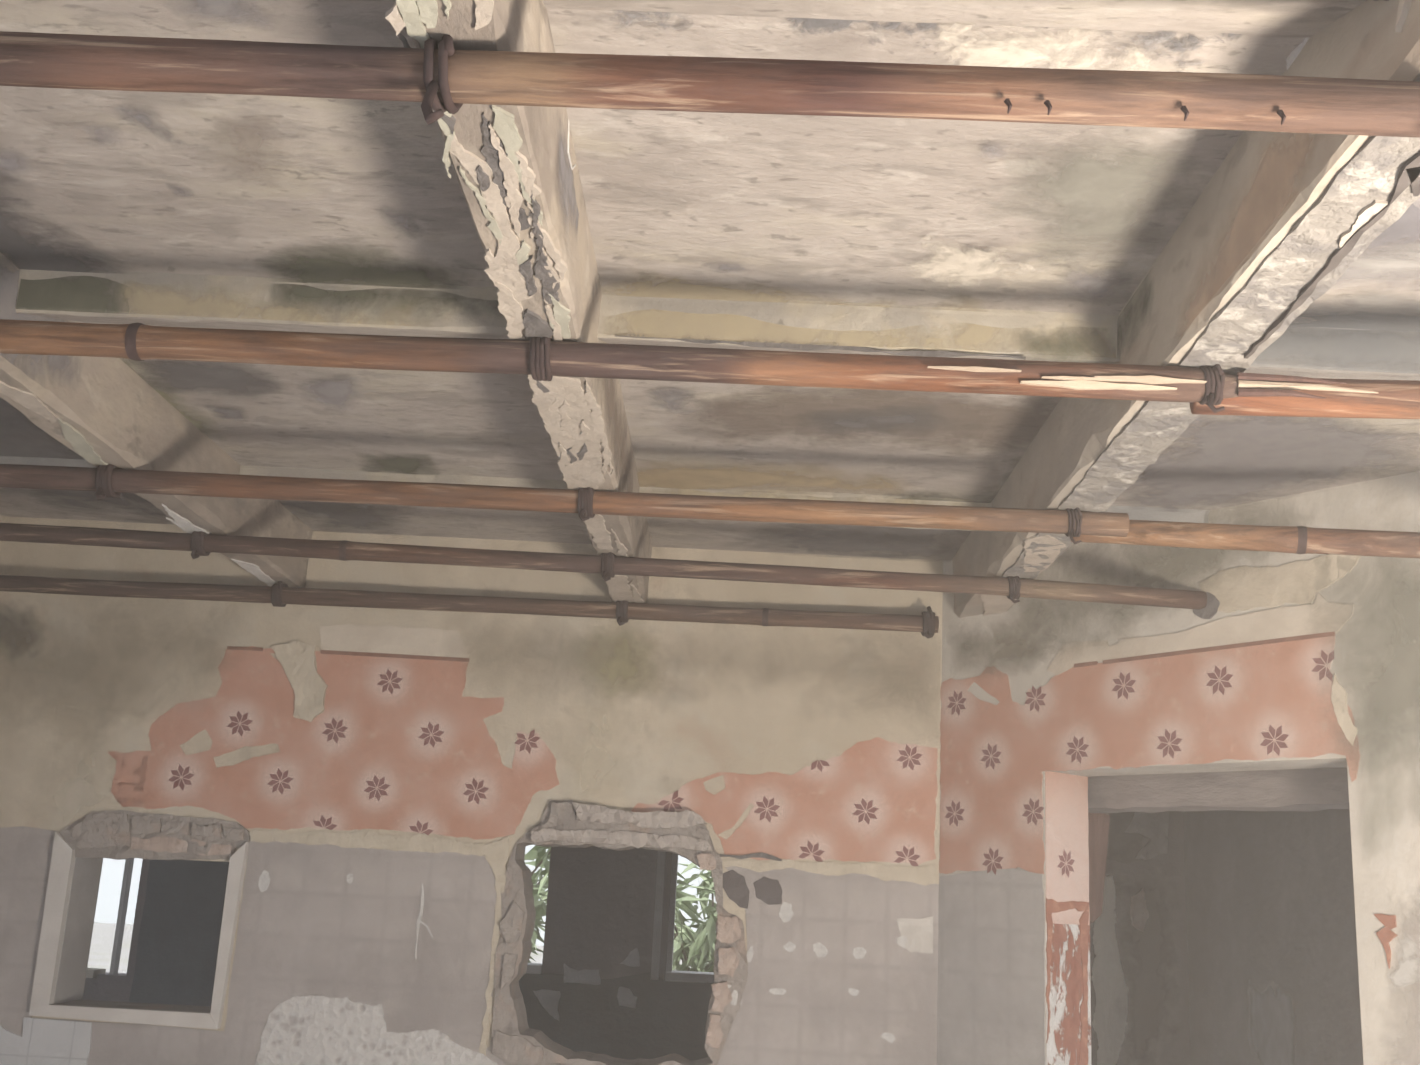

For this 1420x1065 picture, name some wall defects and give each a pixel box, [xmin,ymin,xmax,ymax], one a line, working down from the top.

peeling [385,0,452,48]
peeling [474,0,494,31]
peeling [432,105,571,342]
leakage [1088,547,1225,589]
peeling [0,826,57,1036]
peeling [53,799,1046,1065]